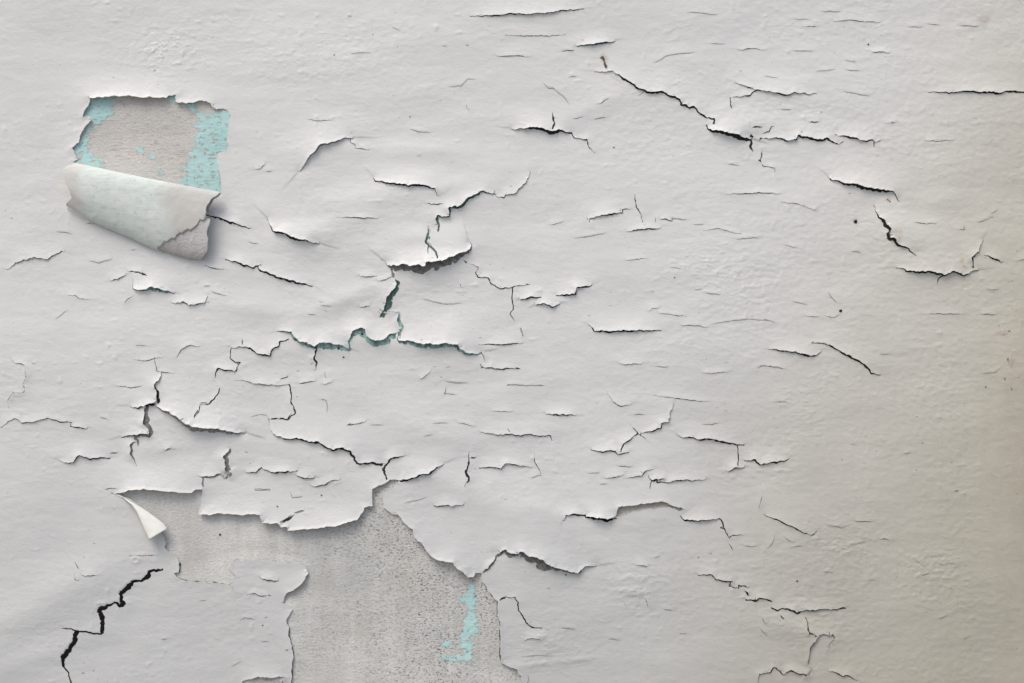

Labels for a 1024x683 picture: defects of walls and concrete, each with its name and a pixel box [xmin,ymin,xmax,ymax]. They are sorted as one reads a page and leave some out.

peeling [64,91,234,260]
crack [60,551,163,683]
peeling [113,476,525,683]